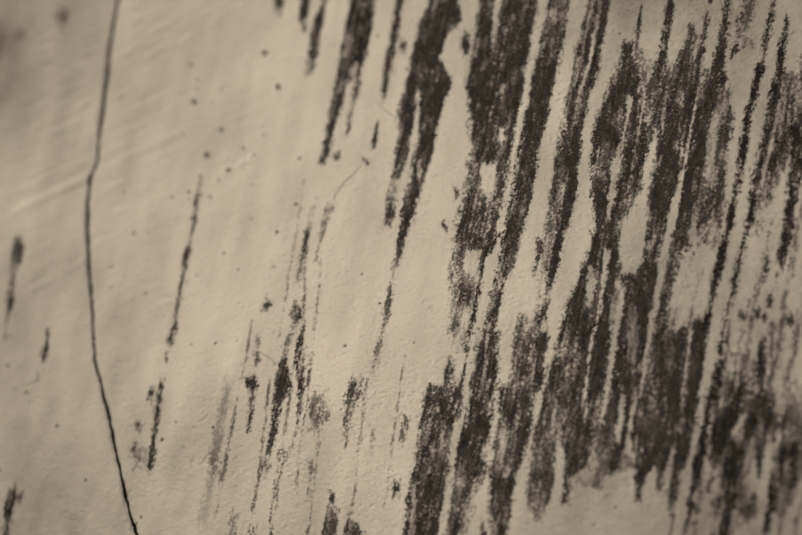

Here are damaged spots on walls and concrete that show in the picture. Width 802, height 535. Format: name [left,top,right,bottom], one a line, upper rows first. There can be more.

crack [86,0,138,535]